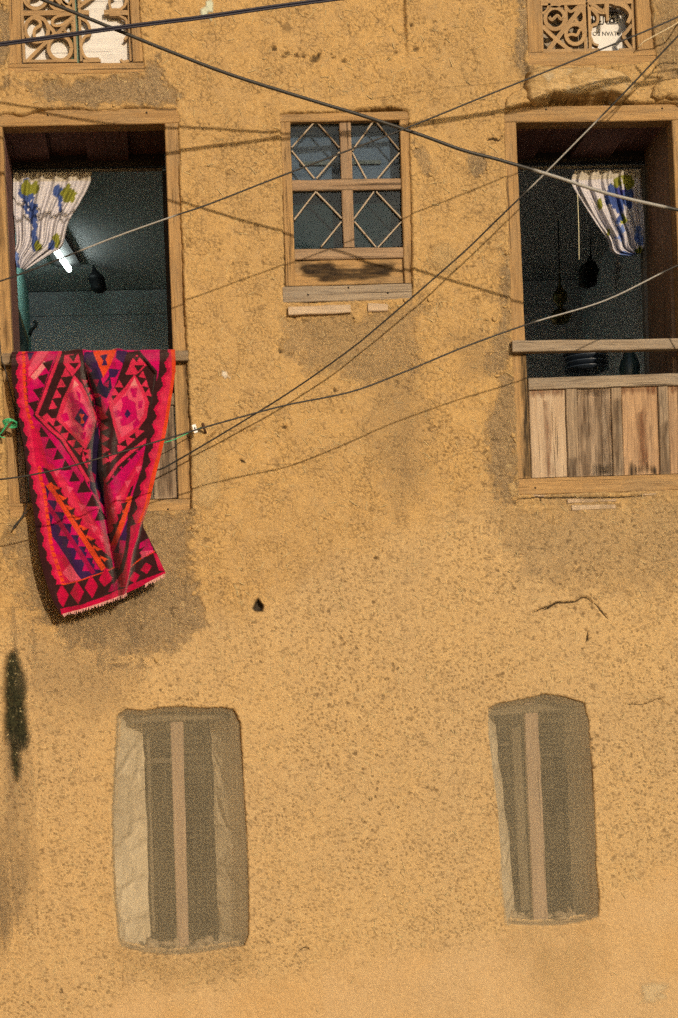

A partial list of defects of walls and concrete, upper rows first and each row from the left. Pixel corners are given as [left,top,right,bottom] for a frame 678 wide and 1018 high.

crack [532,597,607,643]
leakage [5,651,29,780]